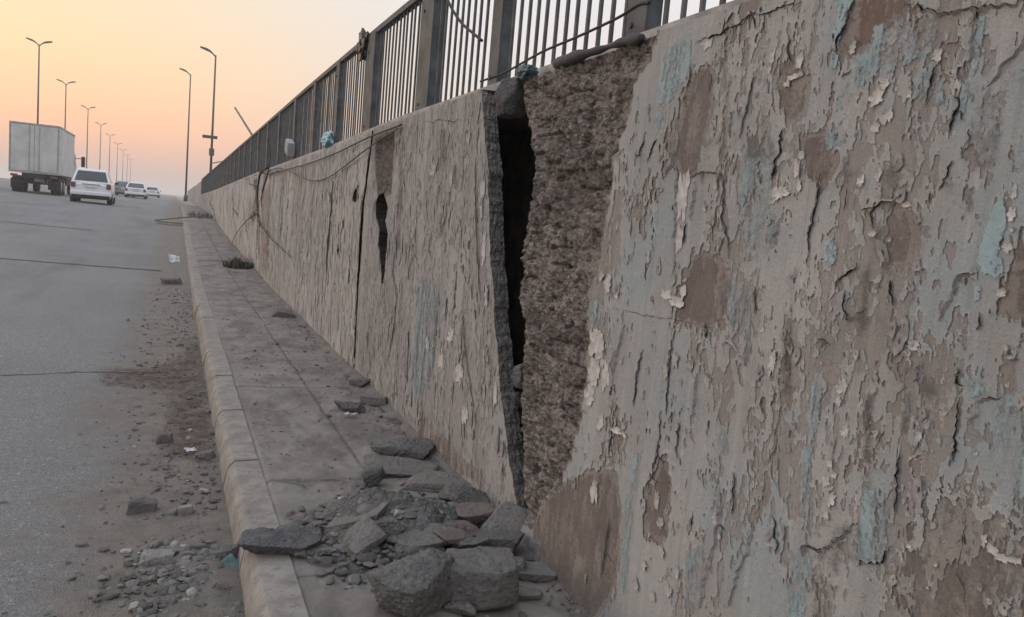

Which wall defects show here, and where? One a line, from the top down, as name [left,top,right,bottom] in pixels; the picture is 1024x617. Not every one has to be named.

crack [695,1,802,42]
peeling [768,77,893,205]
flaking render [767,0,917,118]
crack [905,0,1024,203]
crack [326,137,418,361]
crack [432,111,537,457]
spalling [518,30,732,559]
crack [806,170,824,253]
peeling [883,313,919,357]
peeling [1001,184,1024,279]
crack [950,367,1001,462]
flaking render [884,474,1024,617]